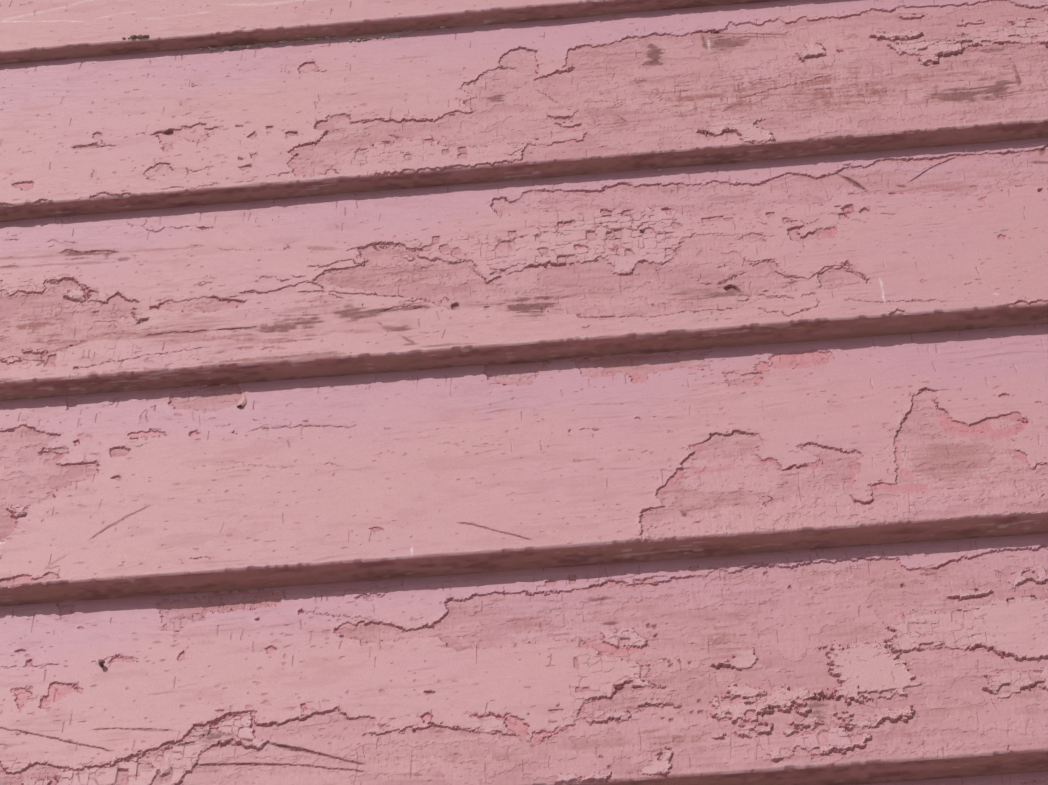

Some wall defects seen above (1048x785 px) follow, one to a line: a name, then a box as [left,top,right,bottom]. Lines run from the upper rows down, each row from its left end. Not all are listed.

peeling [236,0,1048,177]
peeling [291,144,1048,319]
peeling [0,277,346,384]
peeling [0,424,121,559]
peeling [110,409,170,457]
peeling [638,386,1048,542]
peeling [0,544,1048,785]